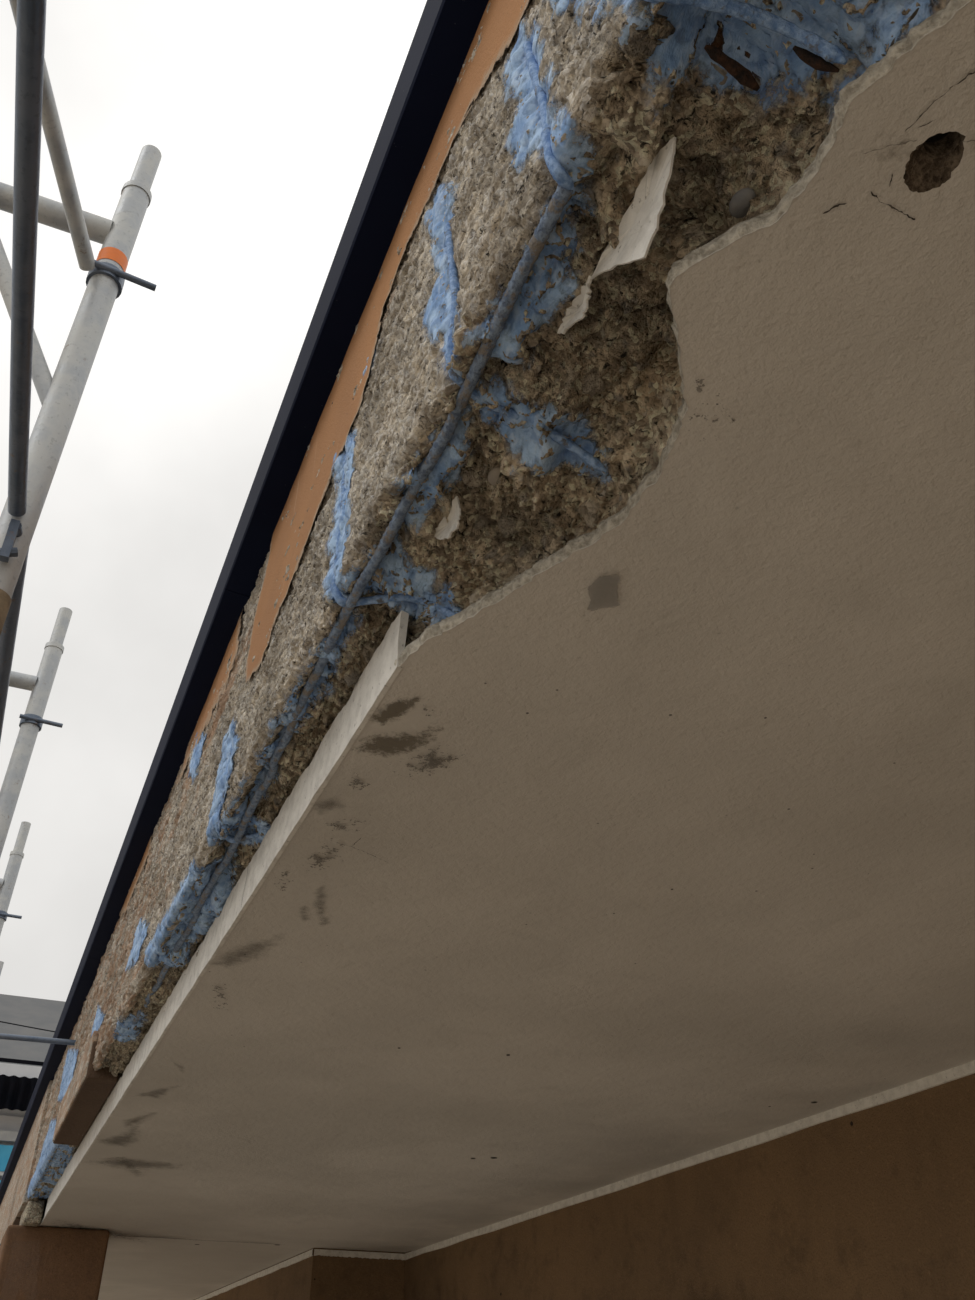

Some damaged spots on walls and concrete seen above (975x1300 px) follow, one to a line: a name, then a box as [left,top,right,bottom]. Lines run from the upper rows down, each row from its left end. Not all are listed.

flaking render [27,0,641,1206]
leakage [362,698,466,777]
spalling [355,0,972,666]
corrosion [694,20,771,80]